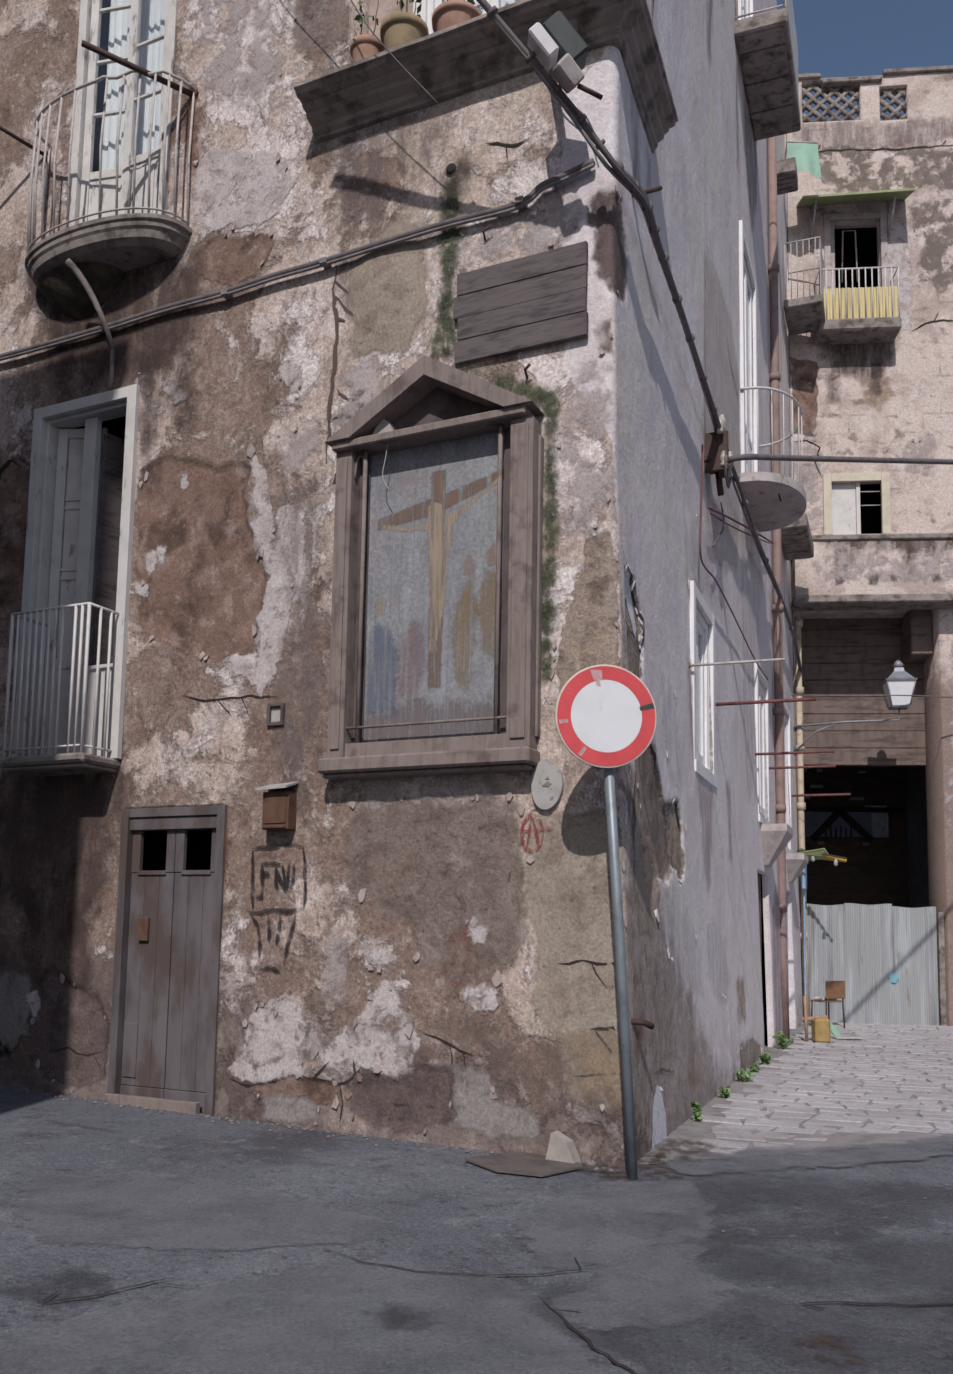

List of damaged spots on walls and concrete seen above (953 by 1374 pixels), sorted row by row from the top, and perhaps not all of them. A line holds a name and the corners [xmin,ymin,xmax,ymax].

flaking render [459,185,628,300]
flaking render [131,443,297,696]
crack [326,263,363,462]
flaking render [548,321,643,691]
flaking render [789,357,823,519]
flaking render [23,966,108,1089]